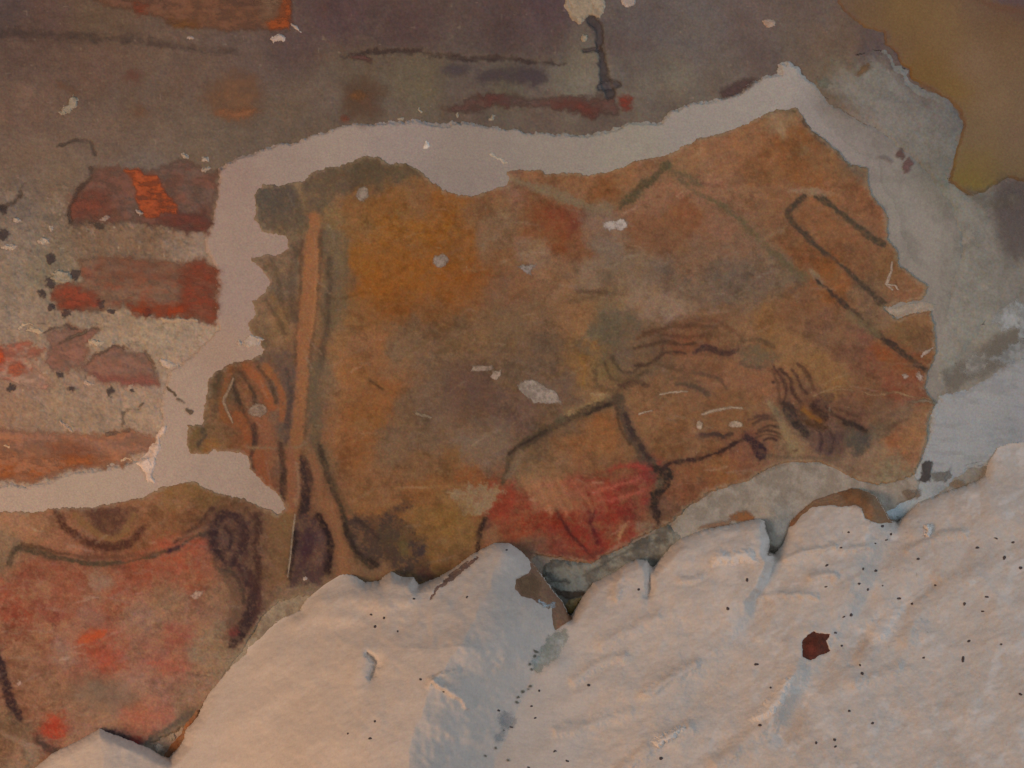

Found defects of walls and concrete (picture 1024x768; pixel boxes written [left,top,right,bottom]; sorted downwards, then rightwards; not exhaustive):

flaking render [721,79,754,98]
flaking render [448,93,633,121]
spalling [356,187,369,201]
spalling [604,219,627,231]
spalling [433,255,448,268]
peeling [237,334,264,348]
spalling [471,365,501,380]
spalling [519,380,561,404]
peeling [789,488,892,527]
peeling [430,556,479,600]
peeling [515,560,581,630]